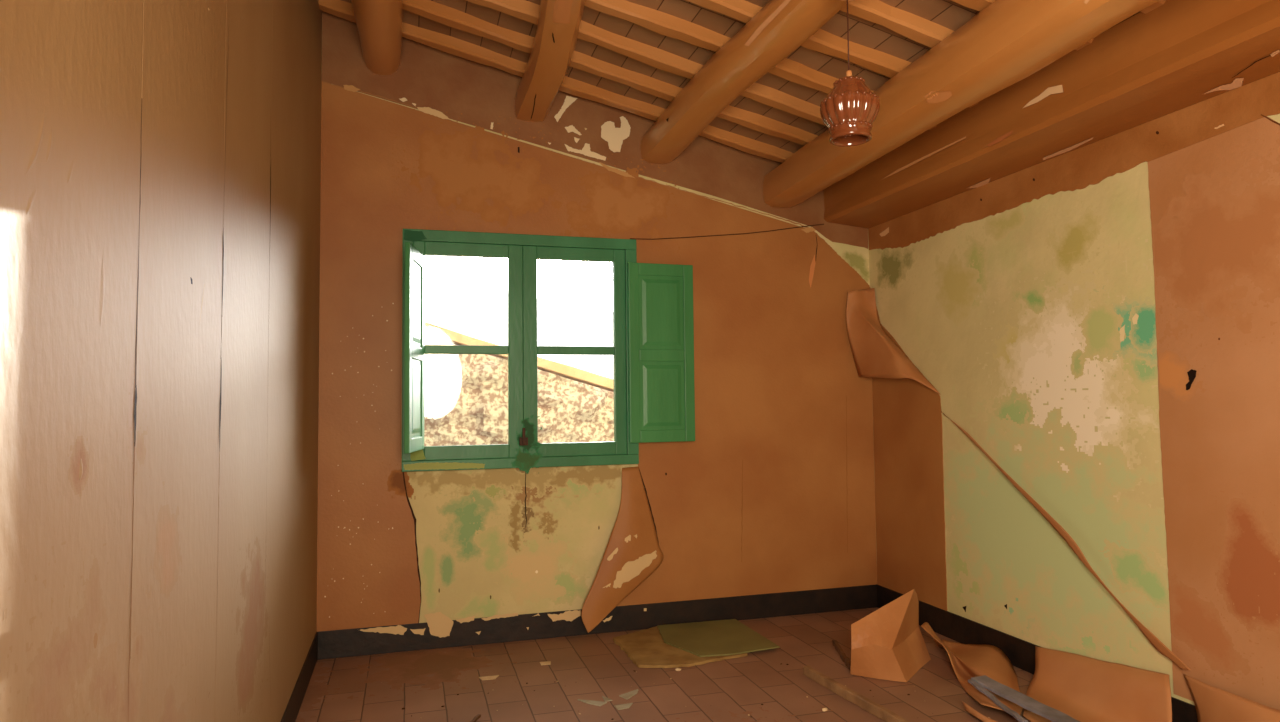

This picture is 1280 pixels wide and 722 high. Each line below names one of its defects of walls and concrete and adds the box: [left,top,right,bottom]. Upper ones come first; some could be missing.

peeling [548,96,815,233]
crack [128,163,141,710]
crack [218,184,226,456]
water stain [841,133,1280,686]
peeling [1119,314,1139,342]
peeling [360,610,581,638]